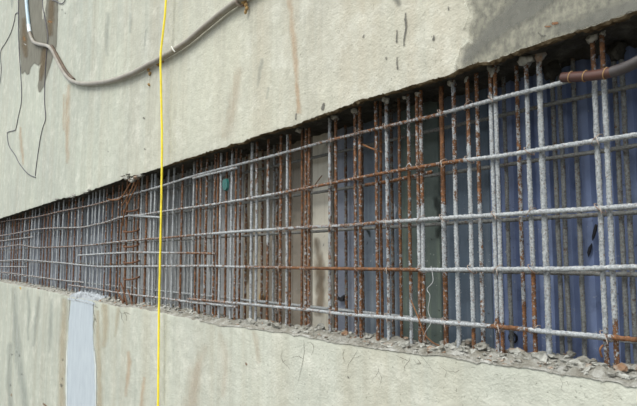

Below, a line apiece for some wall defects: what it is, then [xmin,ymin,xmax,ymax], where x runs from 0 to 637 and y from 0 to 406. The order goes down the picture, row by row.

leakage [19,0,58,92]
leakage [462,0,637,67]
spalling [160,11,637,368]
spalling [0,173,160,306]
spalling [265,329,637,387]